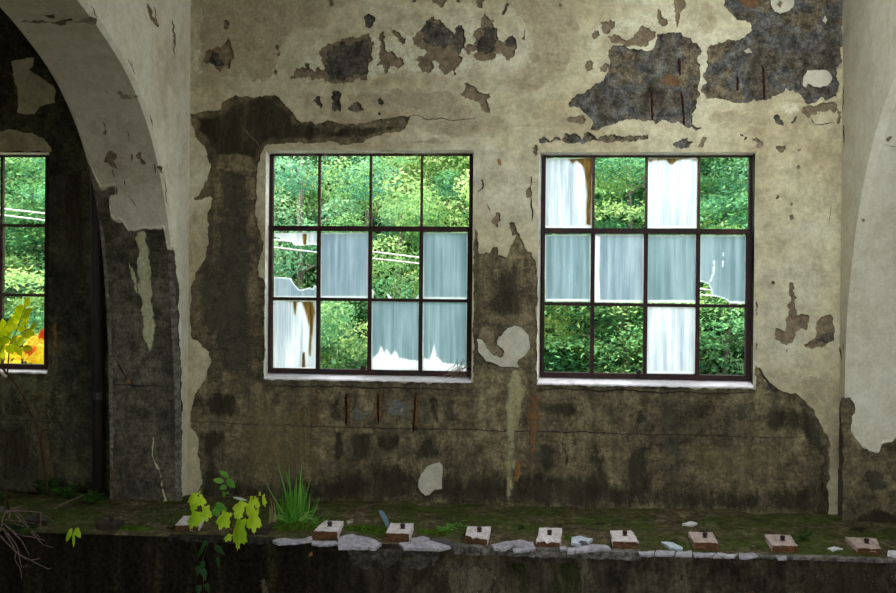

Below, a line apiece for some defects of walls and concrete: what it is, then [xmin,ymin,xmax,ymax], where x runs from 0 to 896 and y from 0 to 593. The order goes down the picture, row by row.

spalling [88,0,896,522]
water stain [196,429,238,496]
water stain [200,392,236,417]
water stain [252,369,829,514]